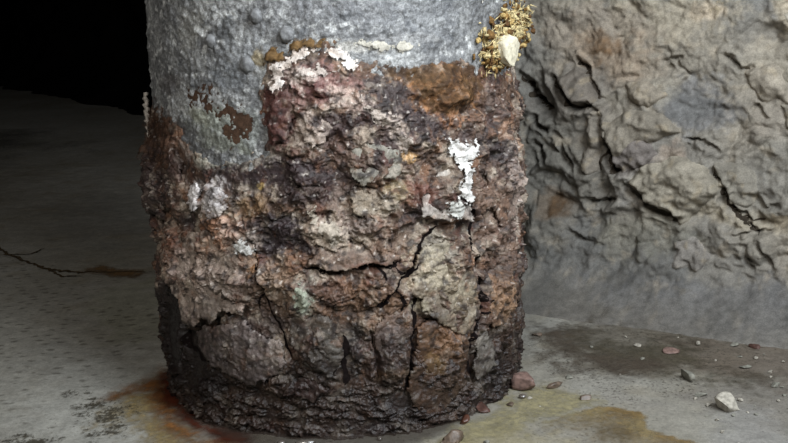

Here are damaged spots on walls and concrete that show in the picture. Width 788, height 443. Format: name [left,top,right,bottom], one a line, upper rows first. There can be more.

crack [521,60,601,111]
leakage [445,138,480,219]
crack [599,136,621,174]
crack [713,169,766,236]
corrosion [110,38,529,443]
crack [250,241,292,361]
crack [302,226,437,394]
crack [467,203,494,379]
leakage [545,326,700,376]
leakage [2,433,65,443]
leakage [62,390,142,443]
leakage [571,406,693,443]